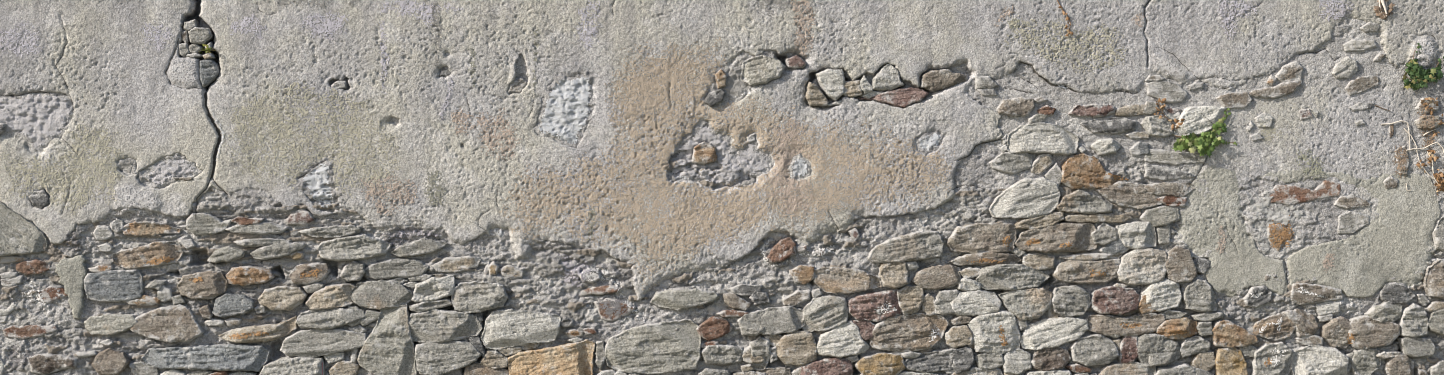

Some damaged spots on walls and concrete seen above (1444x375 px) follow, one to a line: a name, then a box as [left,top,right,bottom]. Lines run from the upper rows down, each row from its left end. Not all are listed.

spalling [0,94,70,150]
spalling [148,155,196,185]
crack [165,38,228,218]
spalling [303,164,334,208]
spalling [539,77,591,144]
spalling [672,125,769,183]
spalling [919,133,941,151]
crack [1120,0,1249,197]
spalling [1249,189,1303,254]